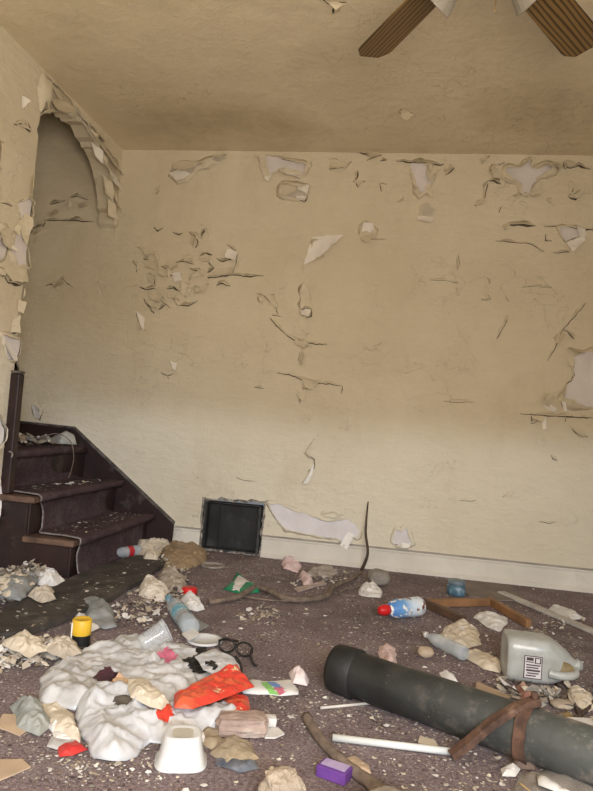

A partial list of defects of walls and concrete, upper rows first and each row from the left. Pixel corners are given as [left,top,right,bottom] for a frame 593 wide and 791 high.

flaking render [37,72,125,228]
peeling [258,153,312,203]
peeling [500,156,563,203]
peeling [0,173,36,271]
peeling [303,235,343,265]
peeling [0,331,21,371]
crack [133,227,343,403]
crack [547,303,586,361]
peeling [544,347,593,413]
peeling [0,415,8,515]
peeling [266,500,362,550]
peeling [2,629,82,660]